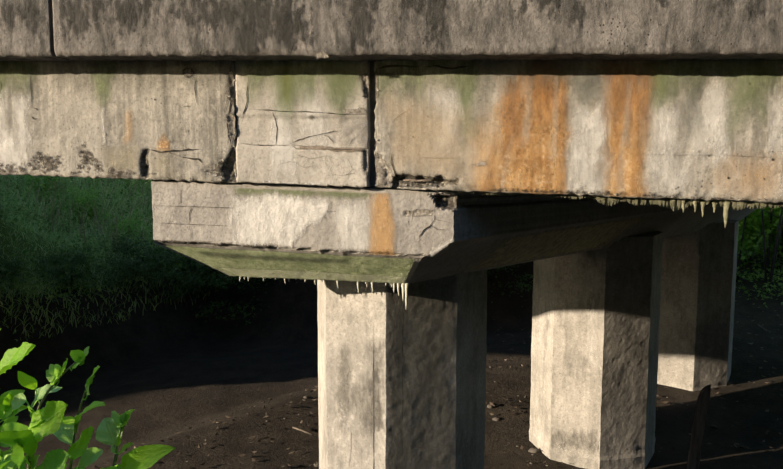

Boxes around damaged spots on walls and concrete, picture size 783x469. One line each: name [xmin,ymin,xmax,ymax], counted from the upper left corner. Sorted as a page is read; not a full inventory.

leakage [59,0,159,42]
leakage [169,0,313,79]
crack [152,148,202,163]
spalling [204,113,237,182]
spalling [225,71,236,102]
crack [224,61,367,176]
spalling [361,139,458,217]
rust [479,68,567,192]
rust [610,83,647,196]
rust [373,194,391,254]
crack [418,196,450,242]
leakage [220,267,453,469]